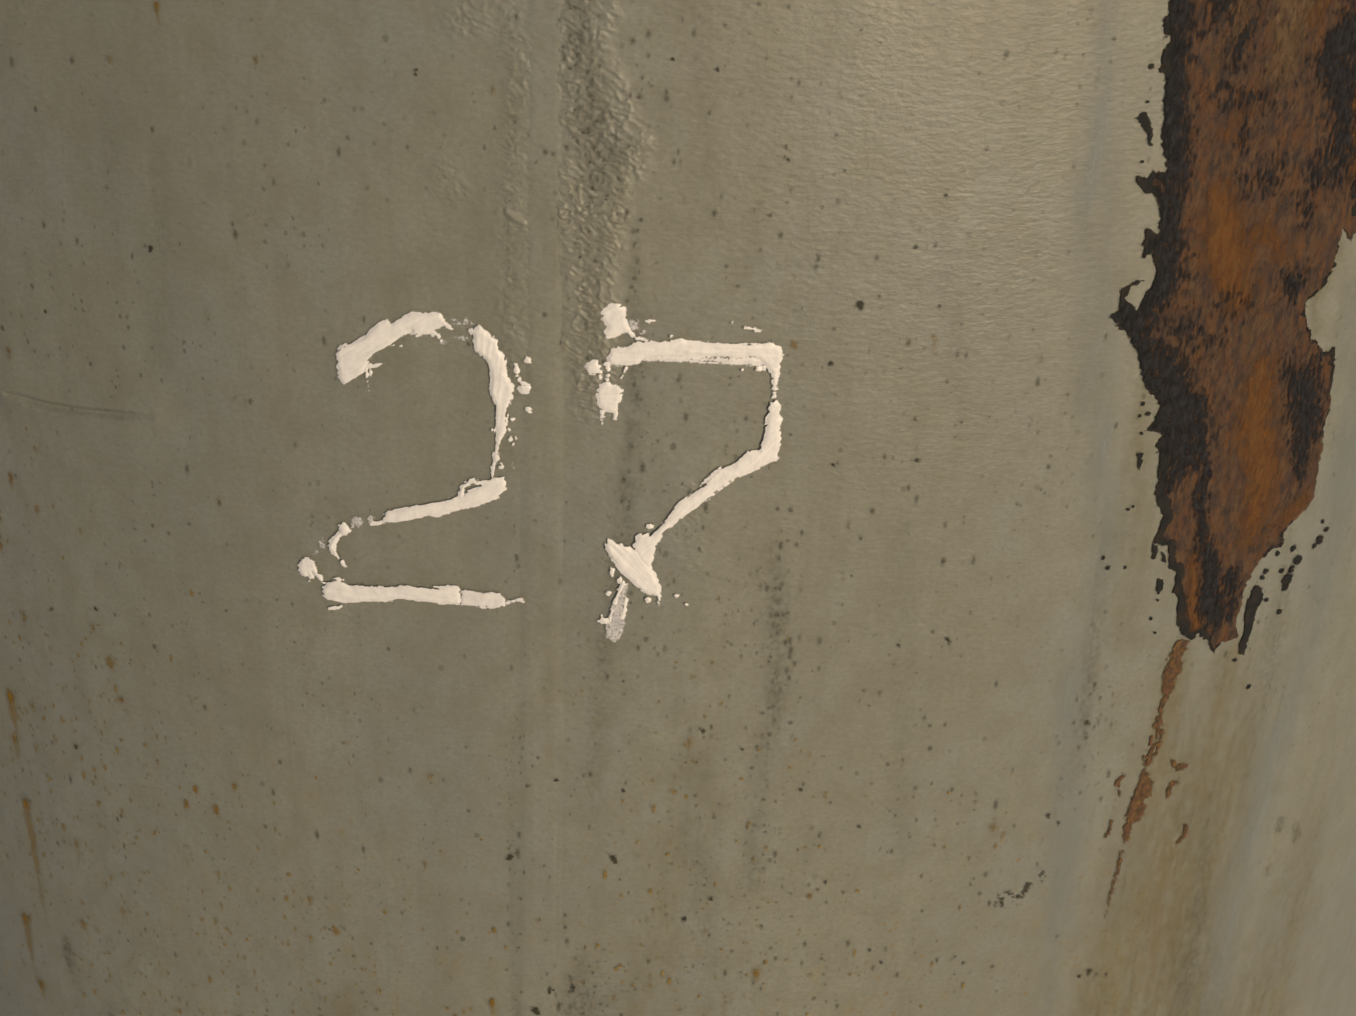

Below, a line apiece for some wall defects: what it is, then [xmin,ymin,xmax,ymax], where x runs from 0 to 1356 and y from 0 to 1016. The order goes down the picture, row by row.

peeling [1111,0,1356,662]
corrosion [1105,639,1189,916]